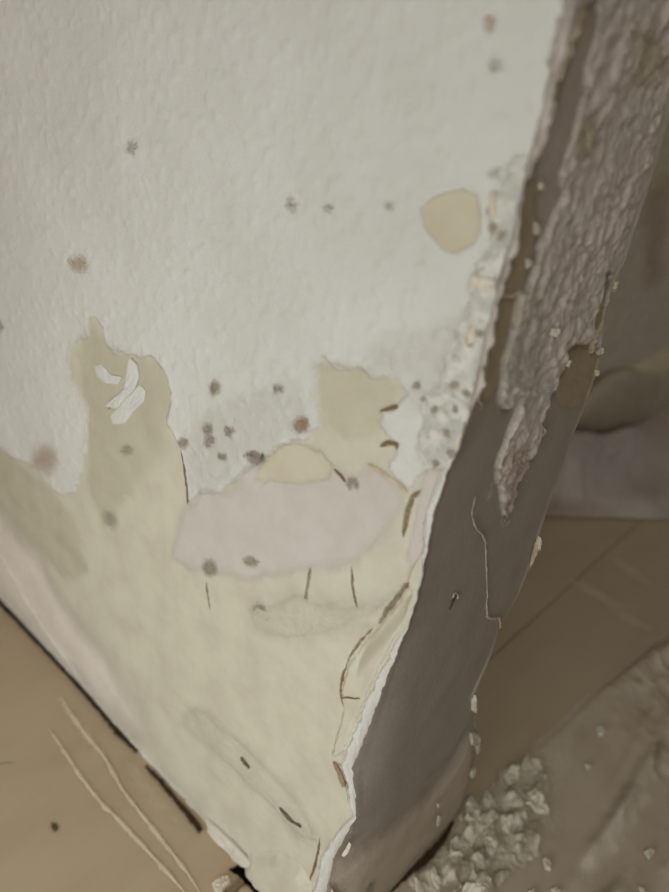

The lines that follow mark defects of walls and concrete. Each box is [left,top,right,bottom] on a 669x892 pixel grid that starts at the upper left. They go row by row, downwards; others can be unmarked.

peeling [0,152,529,892]
peeling [327,0,613,892]
crack [471,497,501,628]